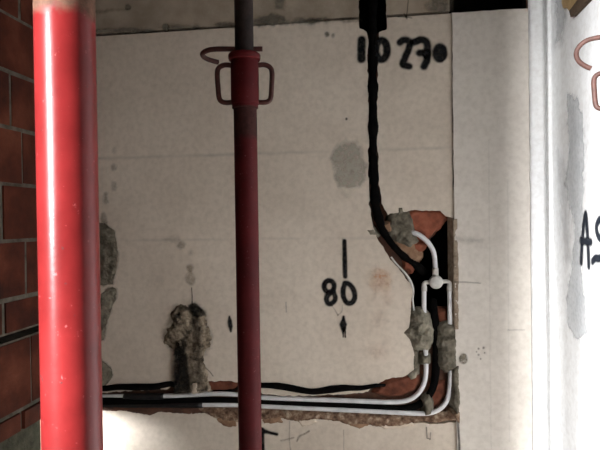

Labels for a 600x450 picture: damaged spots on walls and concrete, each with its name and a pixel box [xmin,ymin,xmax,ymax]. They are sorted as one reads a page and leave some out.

flaking render [410,210,459,330]
flaking render [103,407,238,427]
flaking render [209,381,238,390]
flaking render [261,367,460,450]